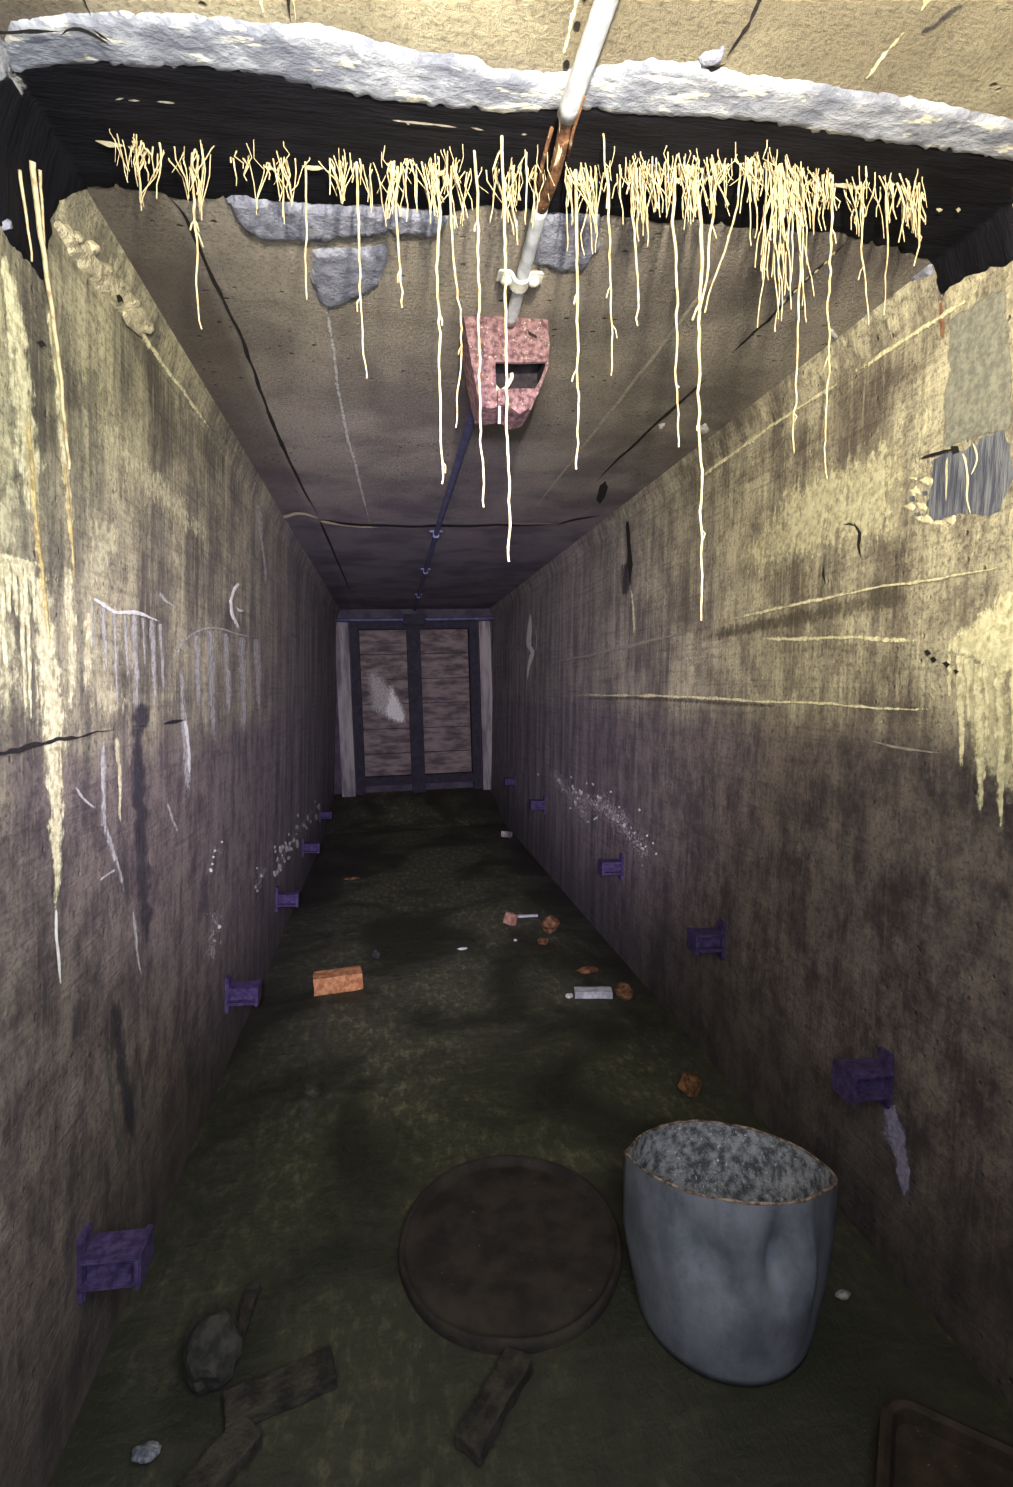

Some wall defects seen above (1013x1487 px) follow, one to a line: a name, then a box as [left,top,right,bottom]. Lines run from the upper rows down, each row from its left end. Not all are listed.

crack [0,0,110,46]
crack [698,0,762,72]
leakage [393,120,484,131]
rust [536,94,587,215]
peeling [225,195,450,310]
peeling [533,212,601,273]
peeling [909,264,933,281]
leakage [741,440,903,574]
peeling [904,430,1013,526]
leakage [0,255,261,983]
crack [0,728,116,755]
leakage [760,590,1013,826]